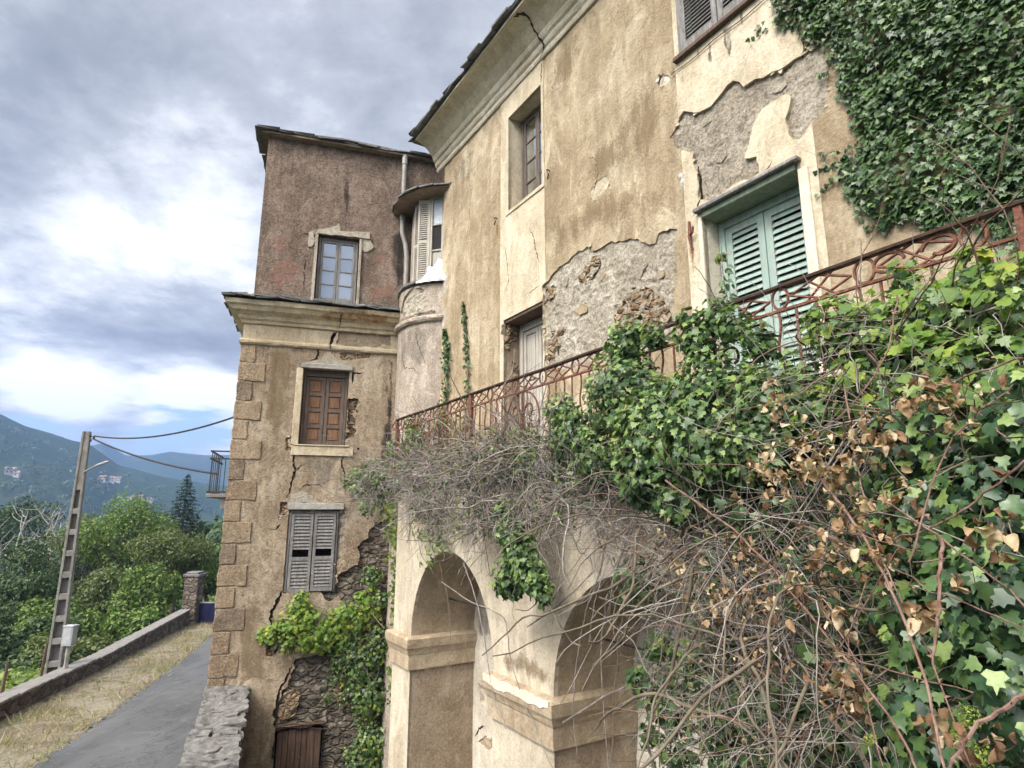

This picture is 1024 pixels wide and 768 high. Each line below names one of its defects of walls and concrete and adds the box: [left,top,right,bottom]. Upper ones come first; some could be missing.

crack [514,11,545,78]
spalling [671,45,831,201]
crack [309,314,342,362]
spalling [542,228,677,372]
spalling [345,399,358,440]
crack [269,455,346,530]
crack [268,592,293,715]
spalling [271,511,389,768]